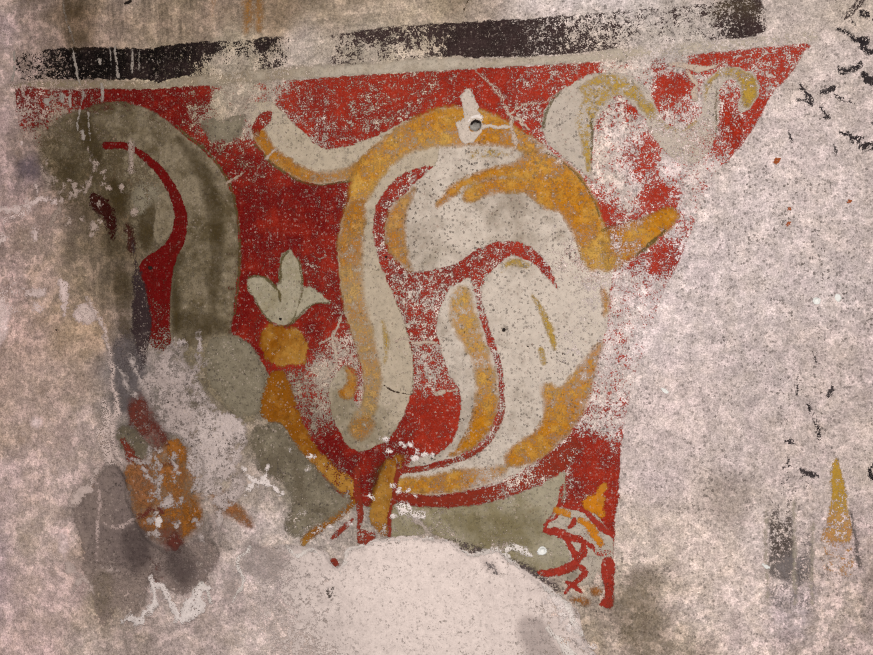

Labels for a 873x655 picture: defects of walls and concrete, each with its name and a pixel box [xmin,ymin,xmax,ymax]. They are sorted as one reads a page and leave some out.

flaking render [231,536,597,655]